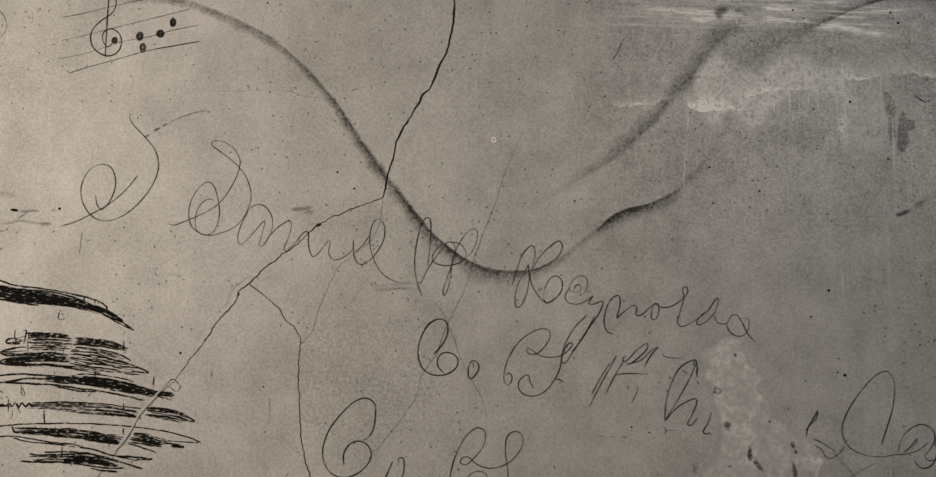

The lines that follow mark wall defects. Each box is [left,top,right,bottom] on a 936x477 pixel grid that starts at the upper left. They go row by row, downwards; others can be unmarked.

crack [98,0,455,477]